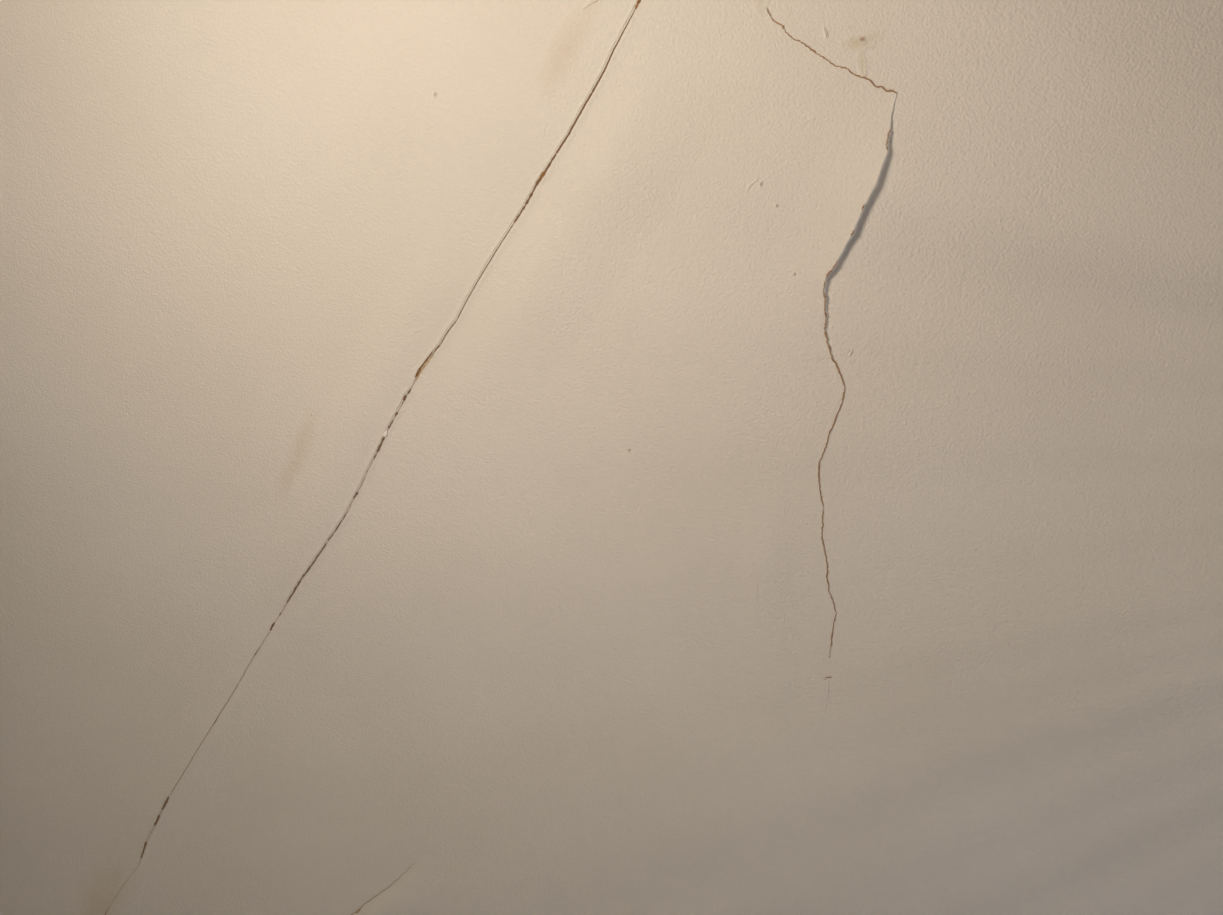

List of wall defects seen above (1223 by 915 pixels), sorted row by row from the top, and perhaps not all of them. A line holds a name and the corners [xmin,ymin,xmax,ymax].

crack [767,8,896,93]
crack [105,0,645,915]
crack [818,260,845,713]